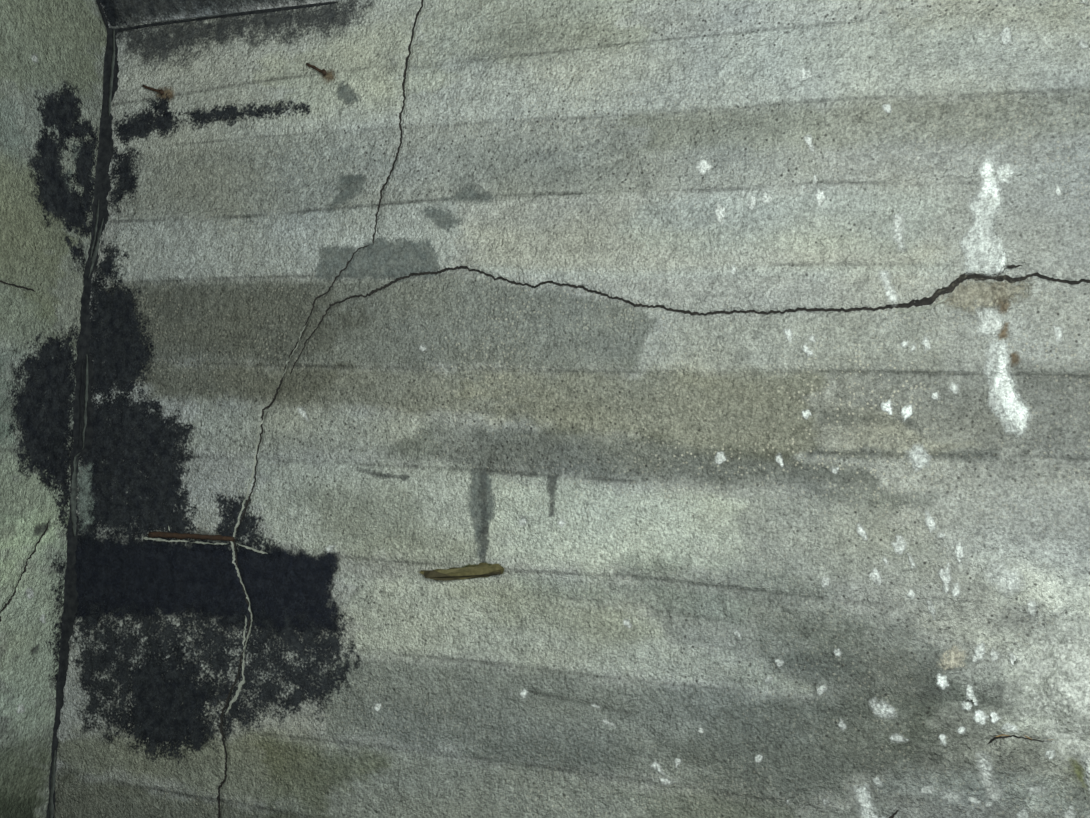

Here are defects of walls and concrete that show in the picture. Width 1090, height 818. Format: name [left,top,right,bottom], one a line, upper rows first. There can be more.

leakage [99,0,373,68]
crack [290,265,1090,374]
crack [0,0,337,818]
leakage [7,82,365,764]
crack [217,0,424,818]
leakage [469,469,494,563]
leakage [548,475,557,516]
crack [988,734,1058,744]